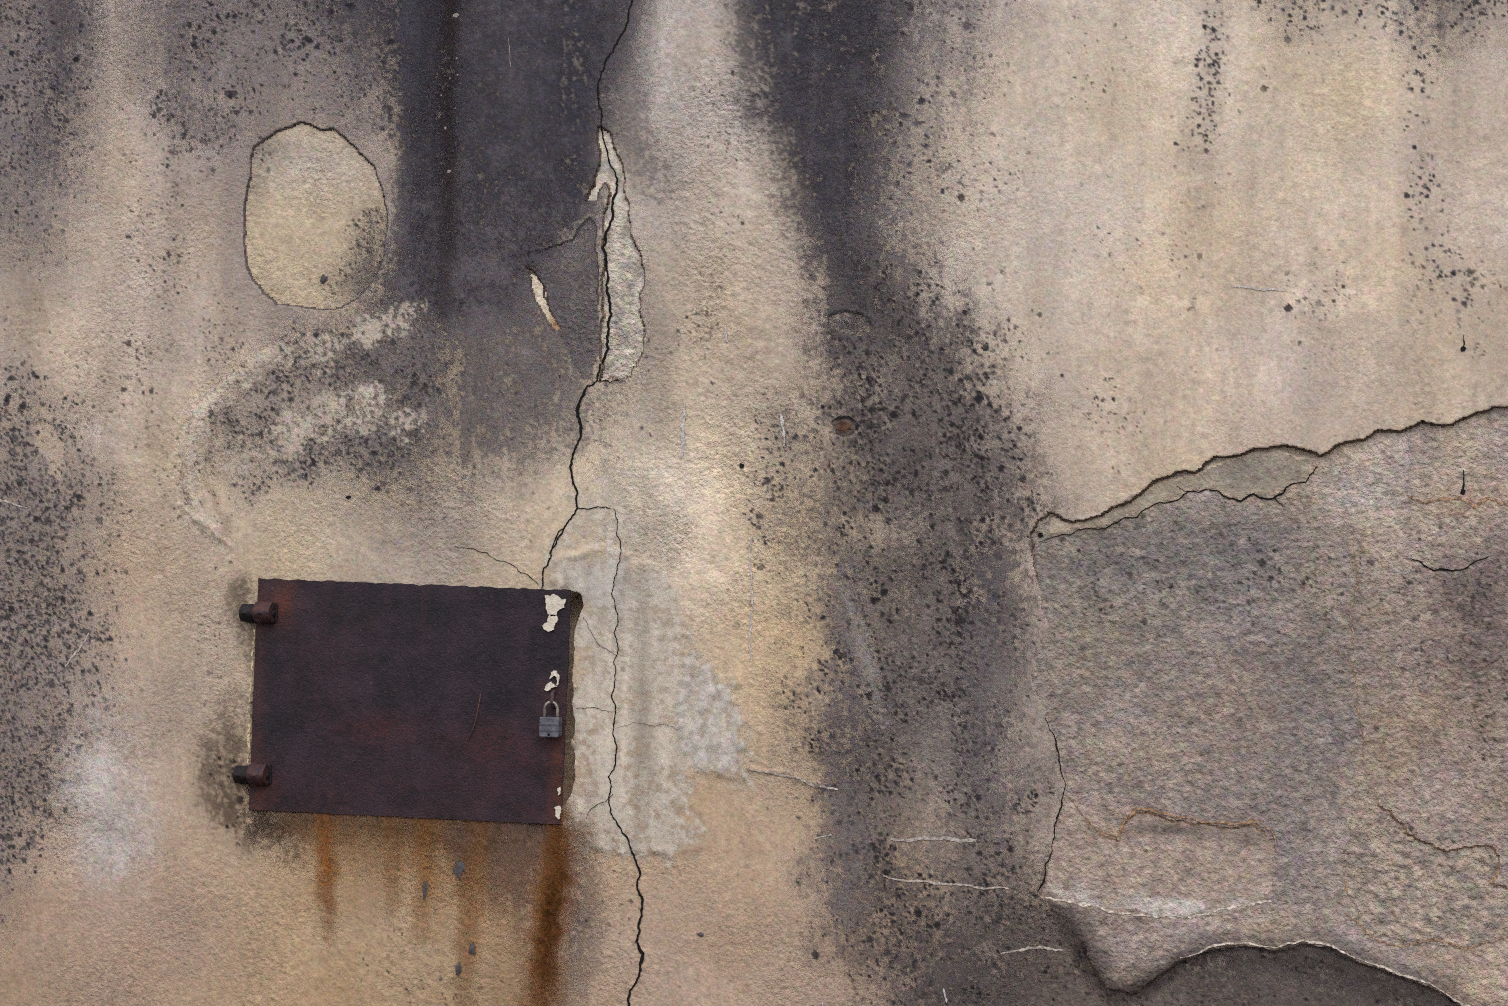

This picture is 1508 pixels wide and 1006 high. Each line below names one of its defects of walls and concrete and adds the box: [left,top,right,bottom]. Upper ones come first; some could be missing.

leakage [0,361,132,893]
spalling [243,121,388,310]
leakage [150,0,645,541]
corrosion [531,849,568,1006]
crack [454,0,678,1006]
spalling [526,126,646,383]
leakage [732,0,1457,1006]
spalling [1030,406,1508,1006]
leakage [1404,115,1480,319]
leakage [1381,0,1508,92]